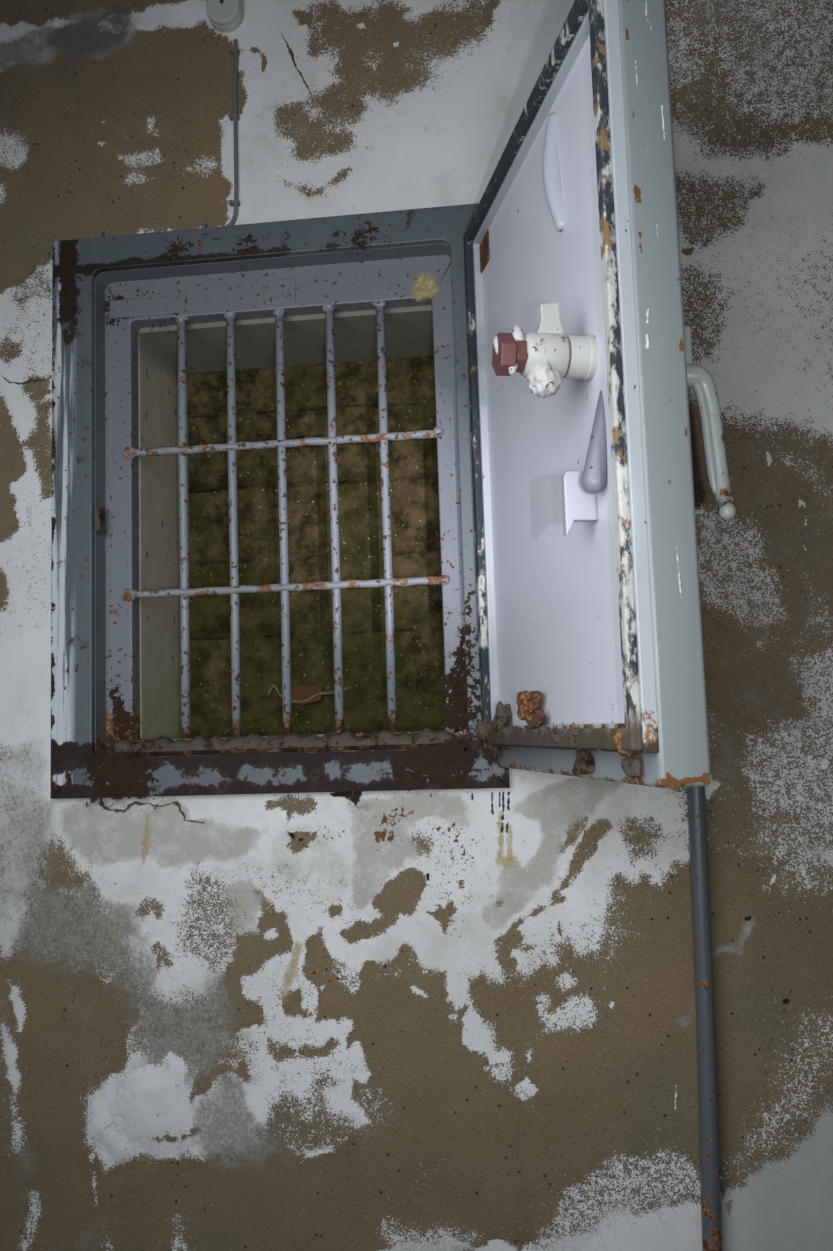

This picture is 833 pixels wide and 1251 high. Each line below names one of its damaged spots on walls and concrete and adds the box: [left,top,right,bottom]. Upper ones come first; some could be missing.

crack [281,33,312,98]
peeling [665,0,833,409]
peeling [0,0,529,637]
rust [70,672,166,863]
rust [374,806,414,853]
peeling [0,390,833,1251]
rust [330,578,548,806]
rust [567,727,597,775]
rust [612,724,644,779]